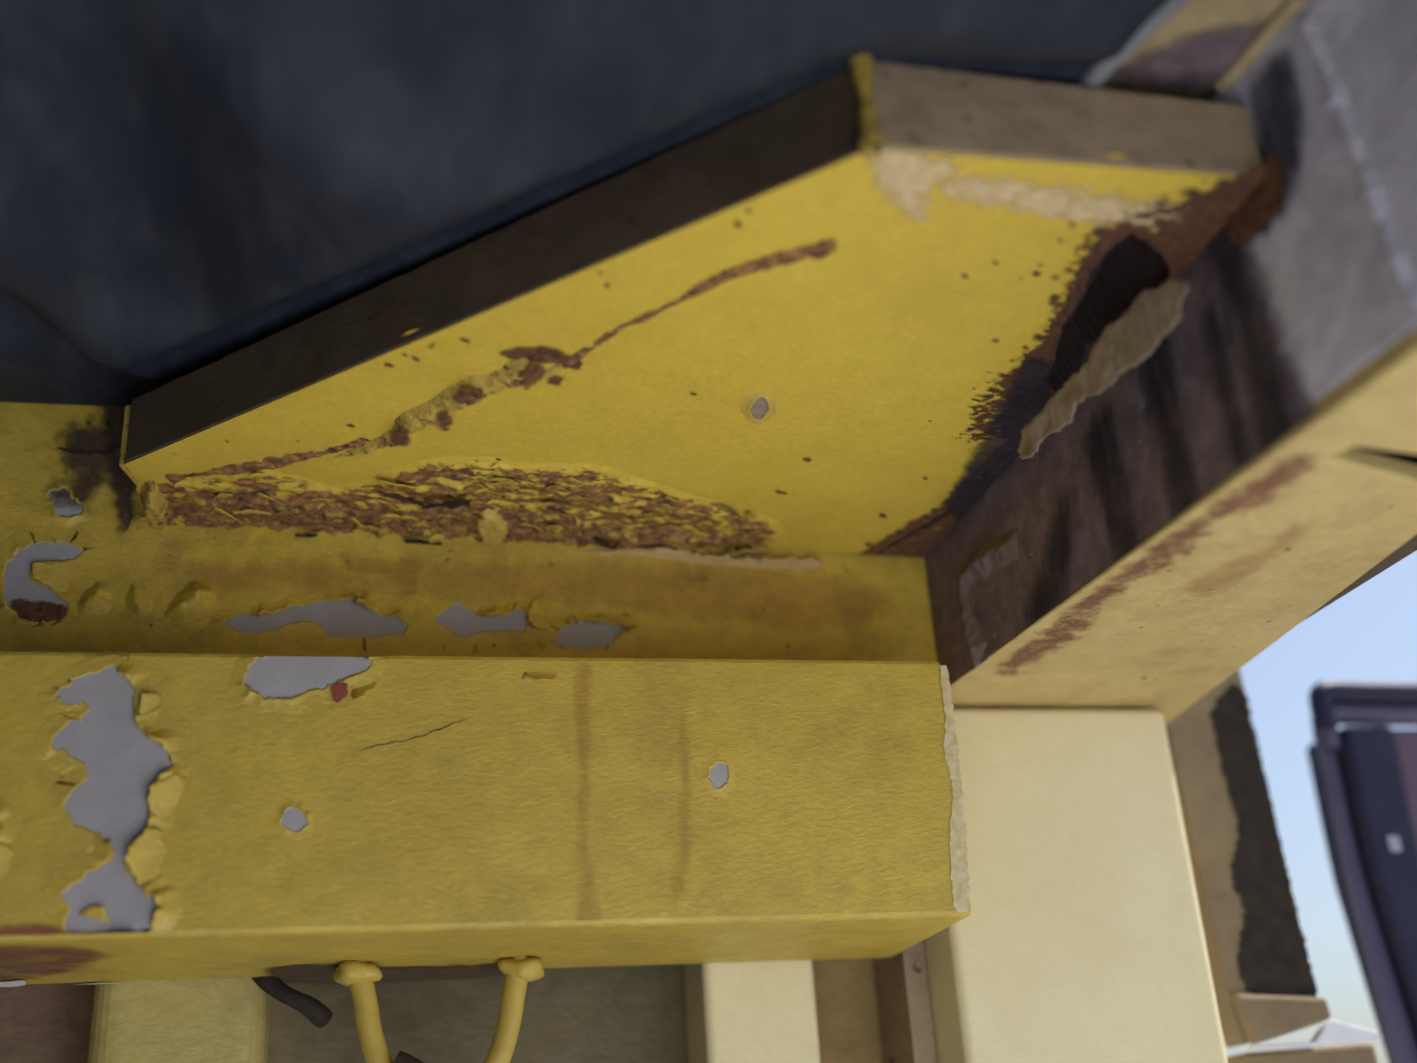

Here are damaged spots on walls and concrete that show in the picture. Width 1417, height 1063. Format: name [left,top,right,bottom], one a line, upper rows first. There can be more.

rust [810,246,835,259]
peeling [849,54,1183,384]
rust [50,405,786,555]
rust [501,346,582,385]
rust [859,149,1315,686]
peeling [0,478,106,641]
peeling [209,587,644,715]
peeling [0,799,22,880]
peeling [30,655,191,935]
rust [0,926,103,981]